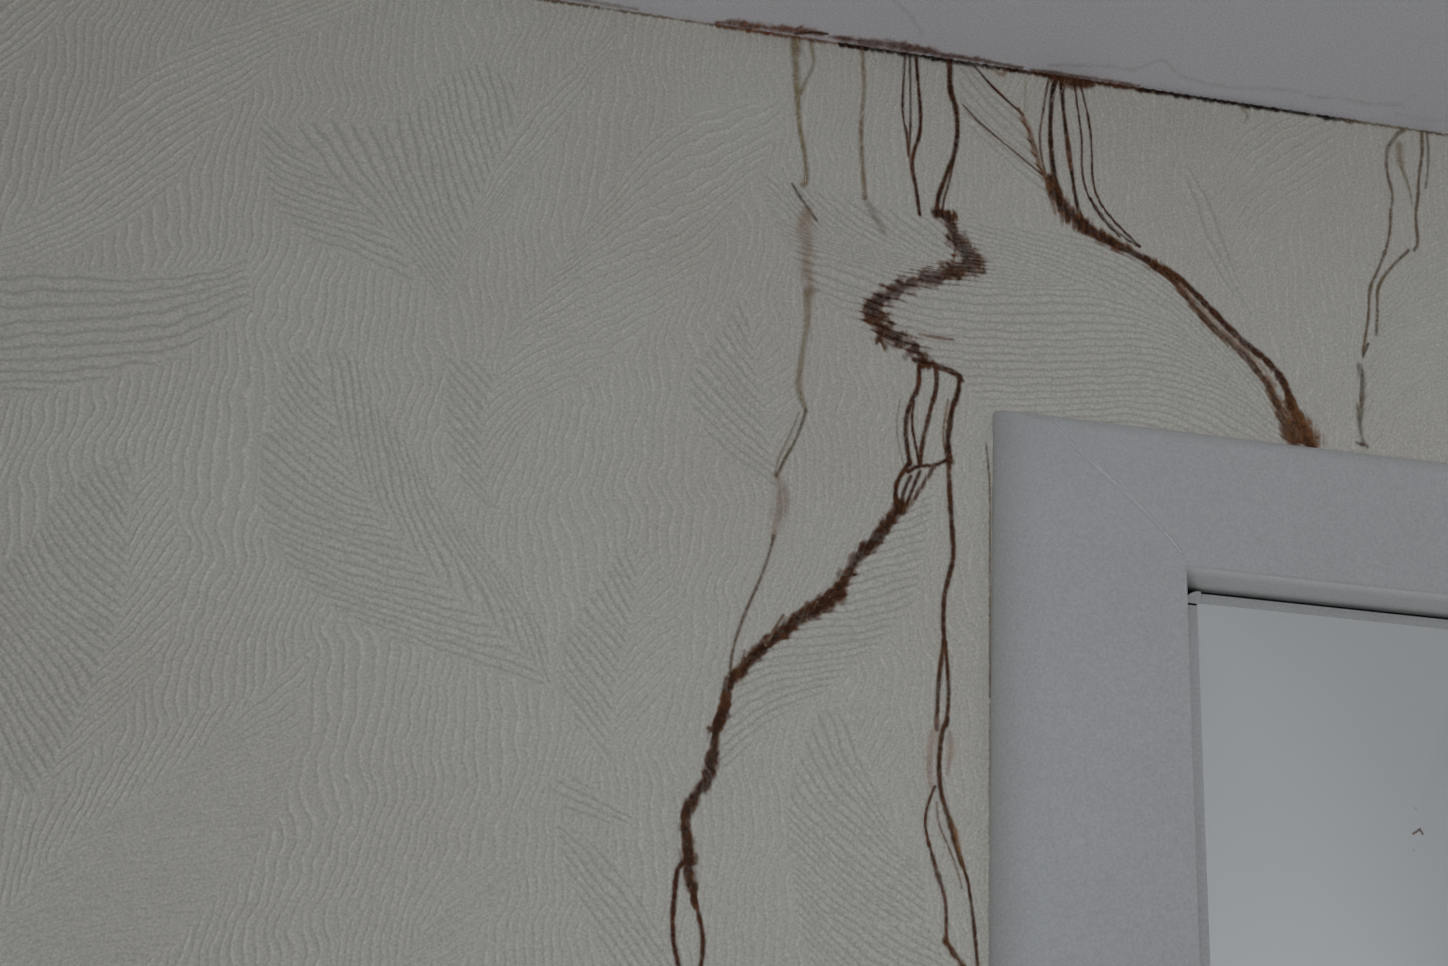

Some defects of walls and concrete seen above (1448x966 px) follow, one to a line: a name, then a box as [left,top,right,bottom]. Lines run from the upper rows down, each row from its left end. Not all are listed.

crack [984,446,992,715]